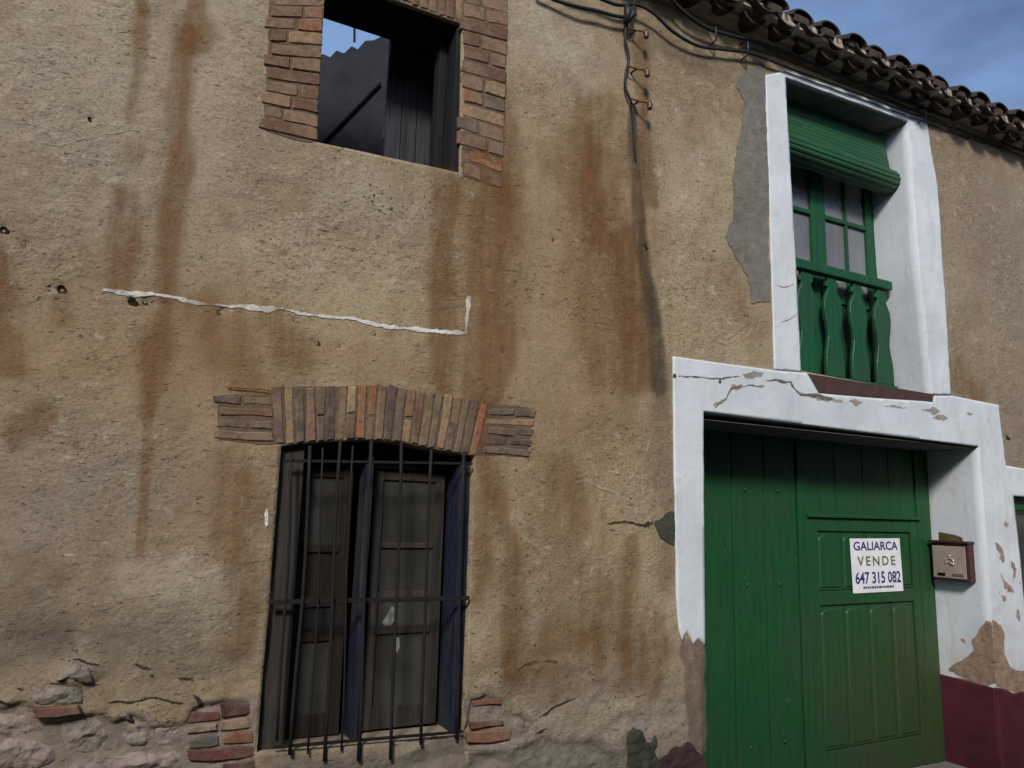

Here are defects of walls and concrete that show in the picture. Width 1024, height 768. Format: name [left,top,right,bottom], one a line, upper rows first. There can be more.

crack [102,288,471,335]
crack [673,373,843,408]
spalling [607,511,675,545]
peeling [995,542,1017,592]
peeling [949,620,1024,693]
spalling [0,694,620,768]